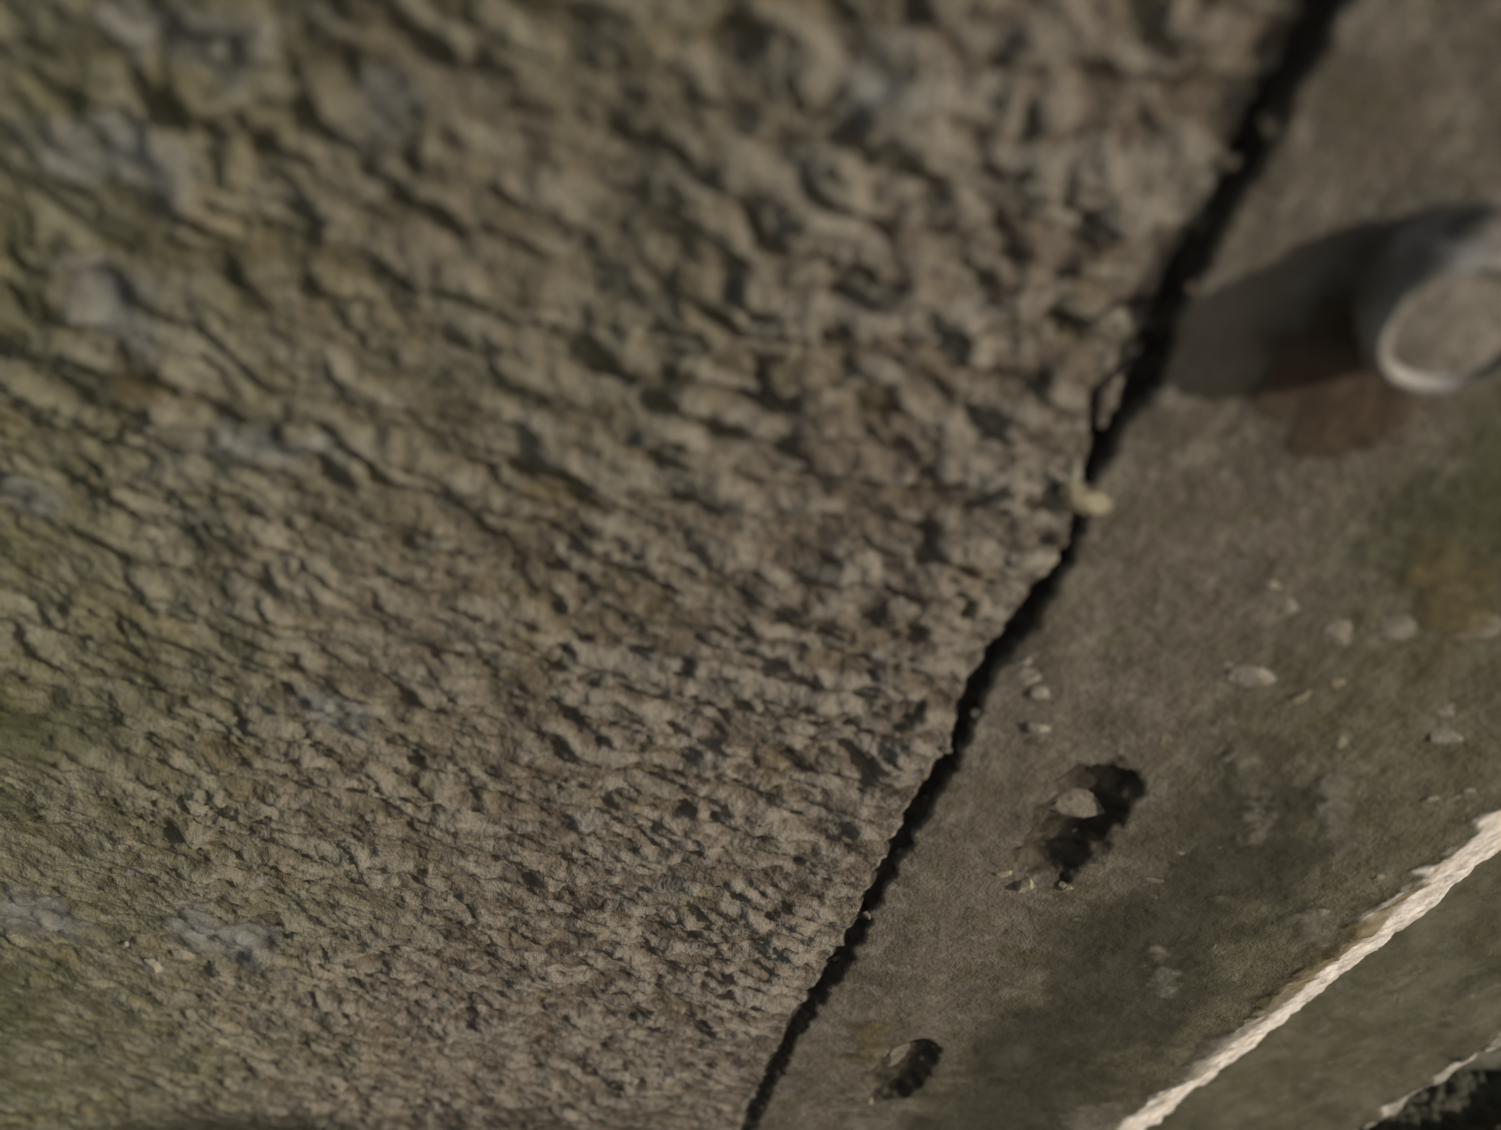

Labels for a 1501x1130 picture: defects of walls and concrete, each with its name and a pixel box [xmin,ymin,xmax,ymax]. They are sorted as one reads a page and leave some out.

crack [741,0,1346,1130]
spalling [1320,621,1352,647]
spalling [1377,615,1417,639]
spalling [1218,663,1276,687]
spalling [1429,704,1463,744]
spalling [993,758,1144,893]
spalling [1114,809,1501,1130]
spalling [861,1038,941,1105]